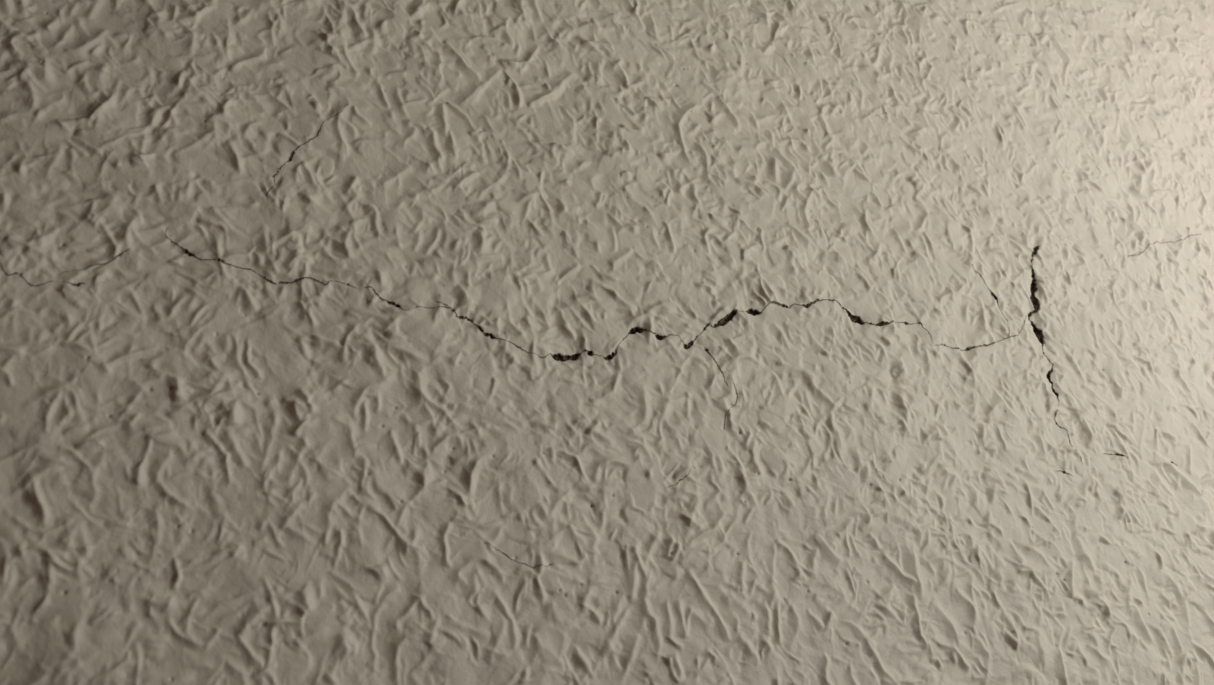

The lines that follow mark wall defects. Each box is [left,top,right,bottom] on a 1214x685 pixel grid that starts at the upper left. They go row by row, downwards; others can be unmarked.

crack [165,229,1128,476]